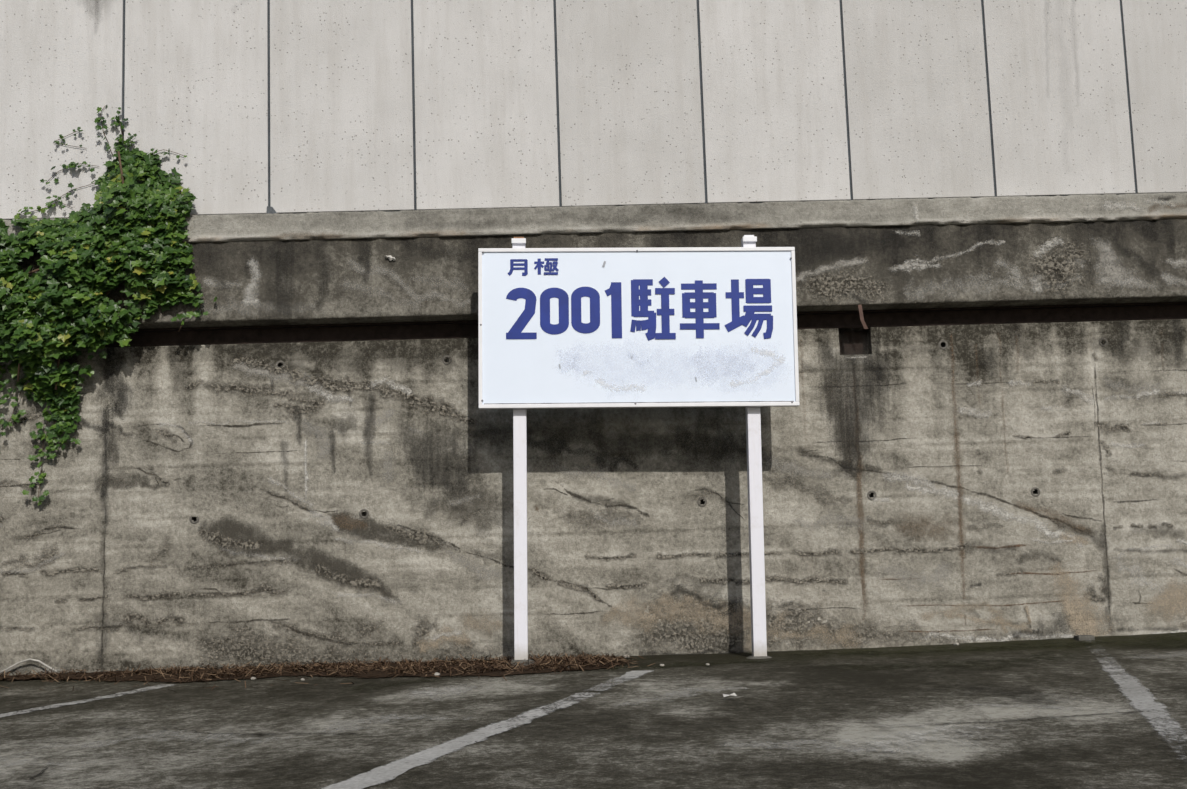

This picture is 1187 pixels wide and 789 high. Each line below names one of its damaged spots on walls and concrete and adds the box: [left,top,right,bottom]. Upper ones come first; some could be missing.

water stain [825,347,888,477]